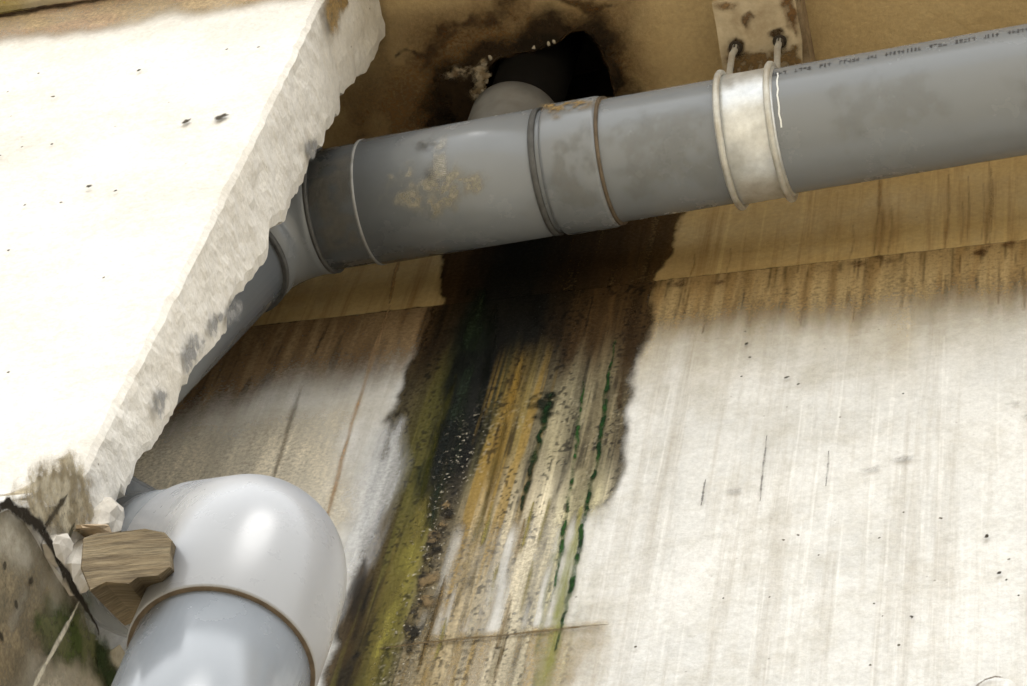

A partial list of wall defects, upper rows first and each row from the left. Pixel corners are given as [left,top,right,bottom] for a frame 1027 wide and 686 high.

damp [326,0,349,32]
damp [350,0,635,143]
damp [133,212,1027,686]
crack [0,485,99,635]
spalling [12,451,125,596]